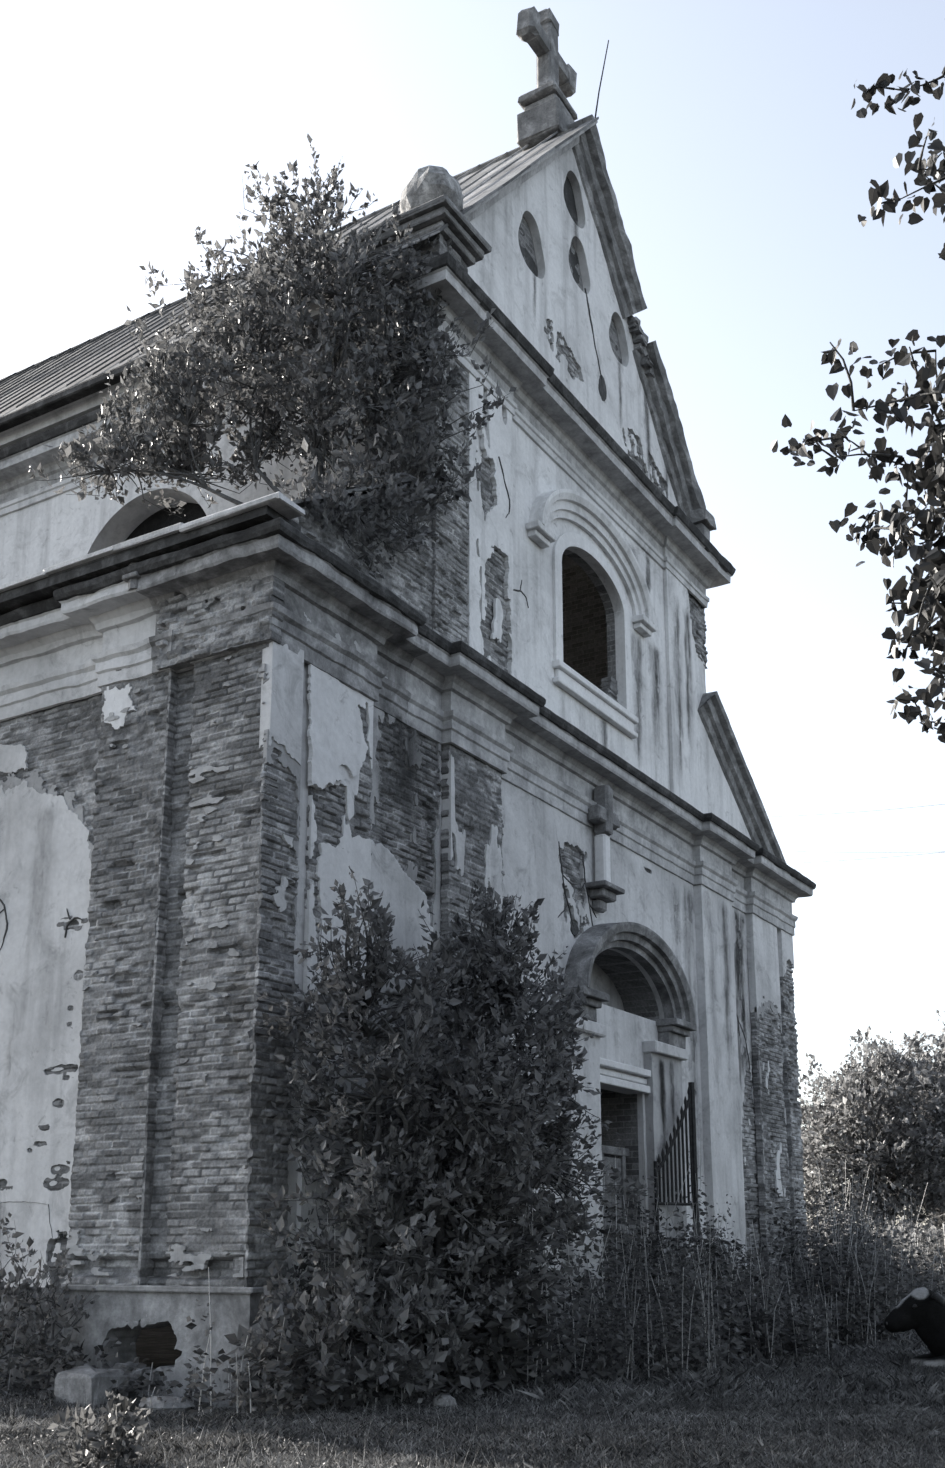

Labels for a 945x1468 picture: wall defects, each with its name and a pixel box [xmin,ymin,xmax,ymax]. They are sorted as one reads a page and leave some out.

flaking render [420,335,508,672]
flaking render [0,667,136,865]
spalling [28,1124,50,1153]
spalling [43,1161,71,1191]
spalling [45,1064,78,1080]
flaking render [244,664,505,1290]
flaking render [558,843,587,937]
flaking render [740,963,808,1272]